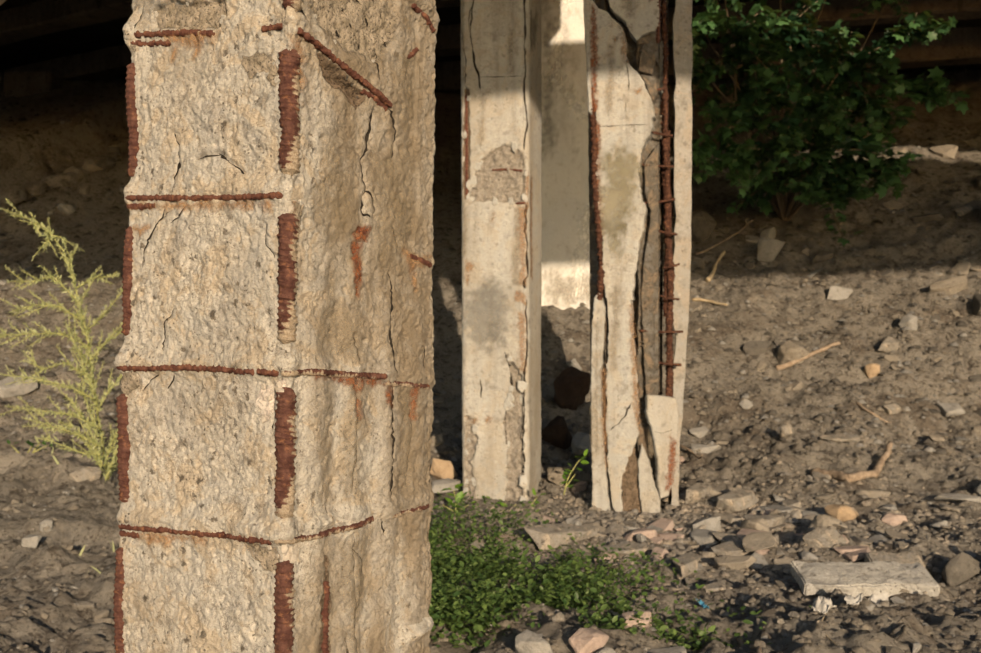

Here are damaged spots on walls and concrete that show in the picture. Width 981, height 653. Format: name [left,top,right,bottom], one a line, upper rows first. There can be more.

crack [174,133,244,182]
spalling [308,0,405,64]
crack [360,109,396,217]
spalling [461,88,528,206]
crack [462,0,528,148]
corrosion [590,6,603,231]
corrosion [351,226,371,296]
corrosion [333,377,378,420]
crack [388,274,428,500]
spalling [463,417,478,499]
spalling [503,354,528,502]
spalling [621,448,641,513]